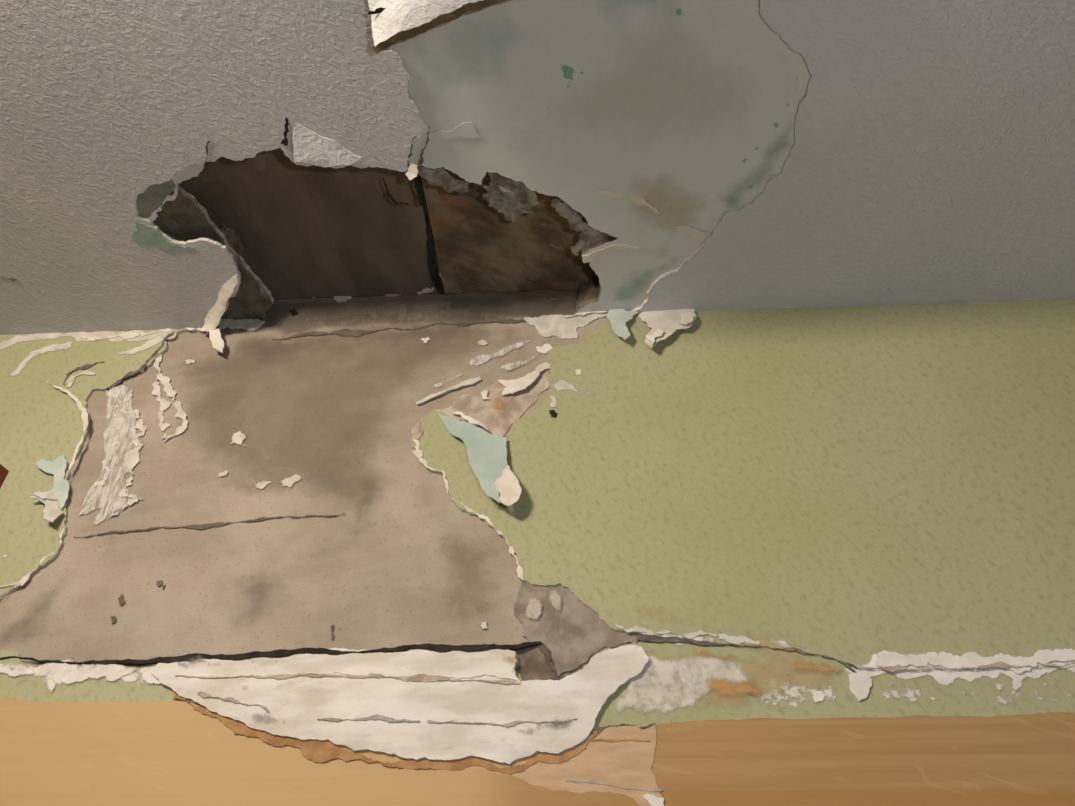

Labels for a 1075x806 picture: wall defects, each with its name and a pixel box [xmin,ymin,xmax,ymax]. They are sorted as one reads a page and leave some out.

damp [563,66,582,79]
spalling [0,0,811,681]
crack [74,513,345,538]
crack [0,641,589,713]
damp [611,623,830,702]
peeling [617,656,836,713]
crack [637,635,1075,673]
peeling [882,688,935,702]
crack [317,714,577,728]